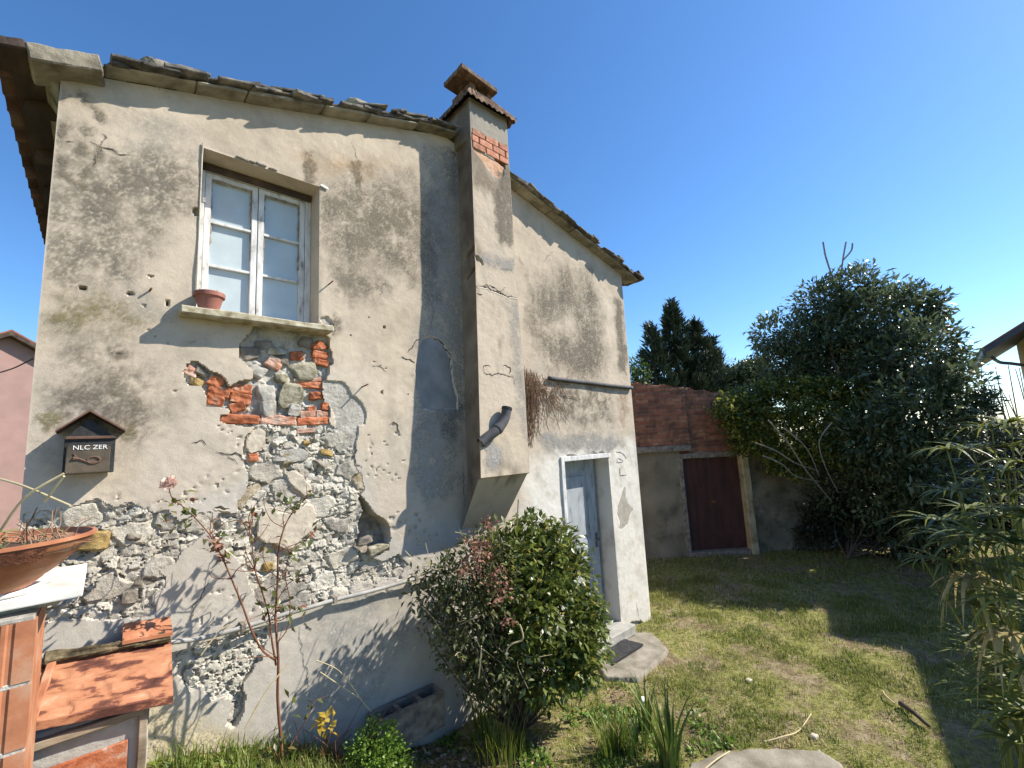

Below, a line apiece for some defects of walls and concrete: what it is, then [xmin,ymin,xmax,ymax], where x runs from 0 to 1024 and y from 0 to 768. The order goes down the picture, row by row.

crack [66,133,126,167]
water stain [47,92,194,282]
flaking render [471,128,508,179]
water stain [495,169,514,245]
water stain [49,299,135,325]
peeling [416,337,457,410]
crack [477,262,522,300]
water stain [512,272,601,419]
water stain [615,299,628,372]
spalling [22,316,421,700]
peeling [617,486,633,529]